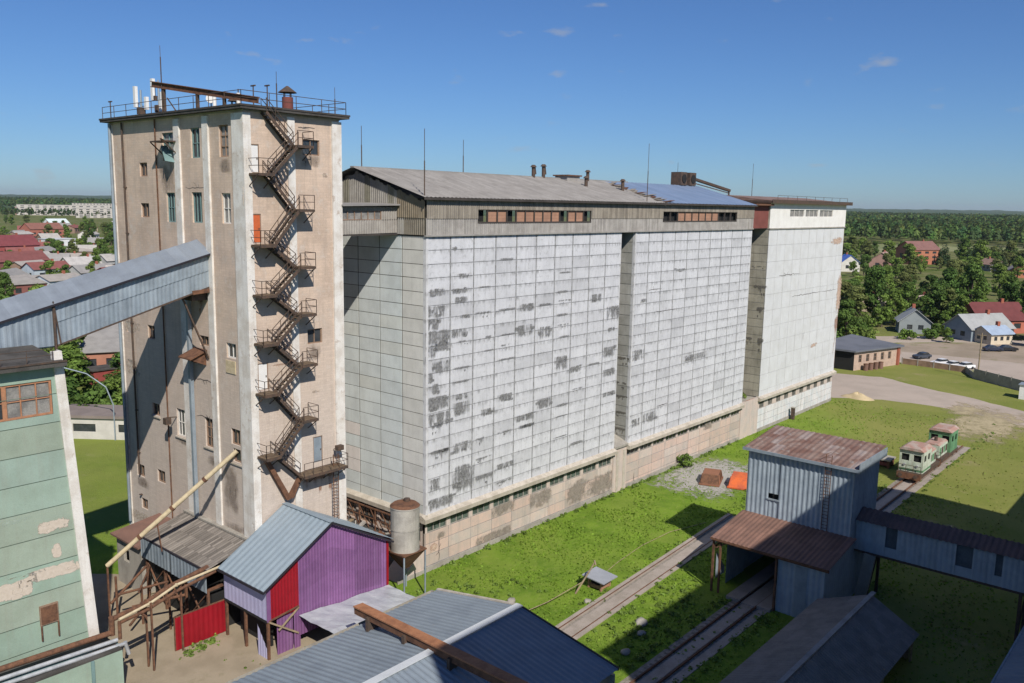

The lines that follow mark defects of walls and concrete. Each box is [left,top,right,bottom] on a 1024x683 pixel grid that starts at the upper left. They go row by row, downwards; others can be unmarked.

water stain [568,471,612,502]
peeling [0,517,80,602]